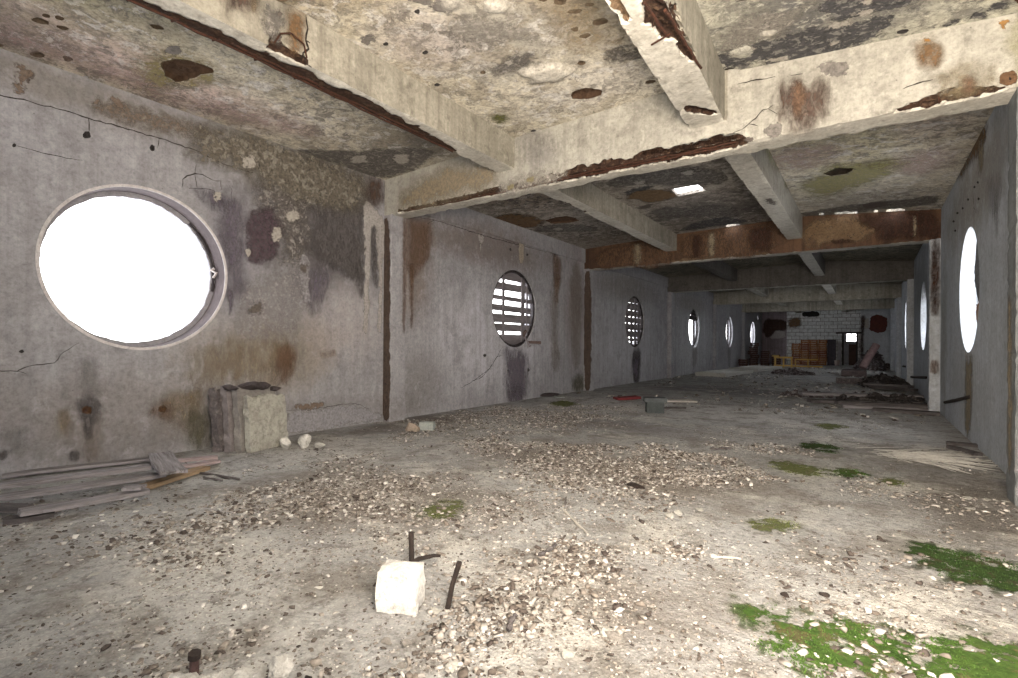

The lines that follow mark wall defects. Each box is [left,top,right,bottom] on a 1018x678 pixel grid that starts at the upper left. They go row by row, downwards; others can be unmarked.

crack [0,95,253,195]
corrosion [137,52,214,93]
flaking render [92,0,457,303]
spalling [609,0,629,21]
flaking render [605,45,641,63]
spalling [642,0,703,69]
water stain [778,79,830,130]
crack [1,343,78,374]
corrosion [383,218,391,421]
corrosion [403,220,430,327]
corrosion [584,223,776,391]
corrosion [802,211,941,315]